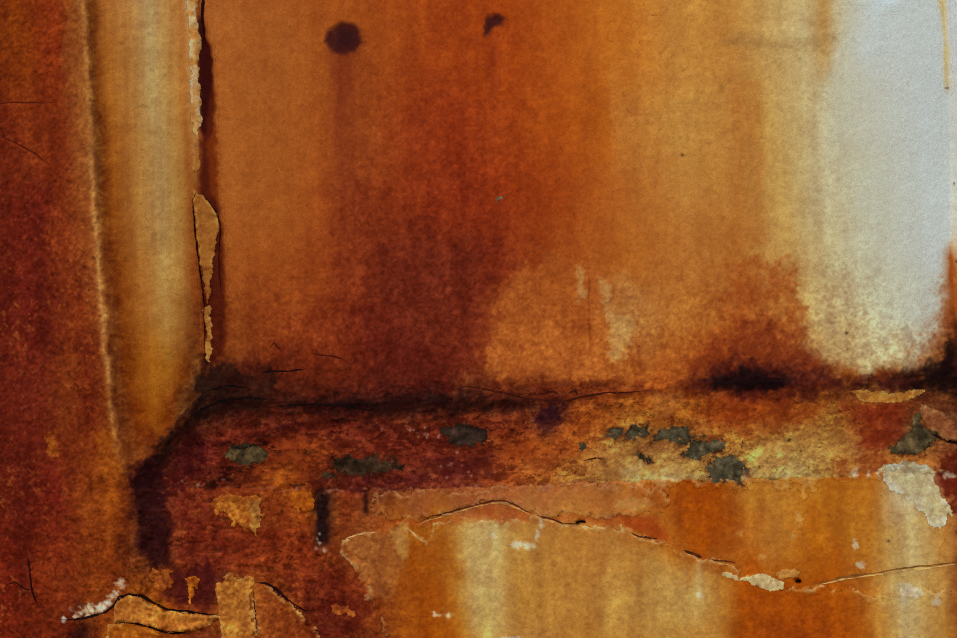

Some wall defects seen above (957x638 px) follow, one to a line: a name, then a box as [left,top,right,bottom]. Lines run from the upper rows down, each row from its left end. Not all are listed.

peeling [186,0,203,138]
rust [0,0,125,638]
peeling [59,568,320,638]
peeling [193,190,219,362]
crack [190,343,381,417]
rust [194,0,601,385]
rust [120,244,914,638]
crack [451,386,657,404]
peeling [212,413,957,638]
damp [683,345,924,409]
peeling [771,389,957,540]
rust [898,237,957,413]